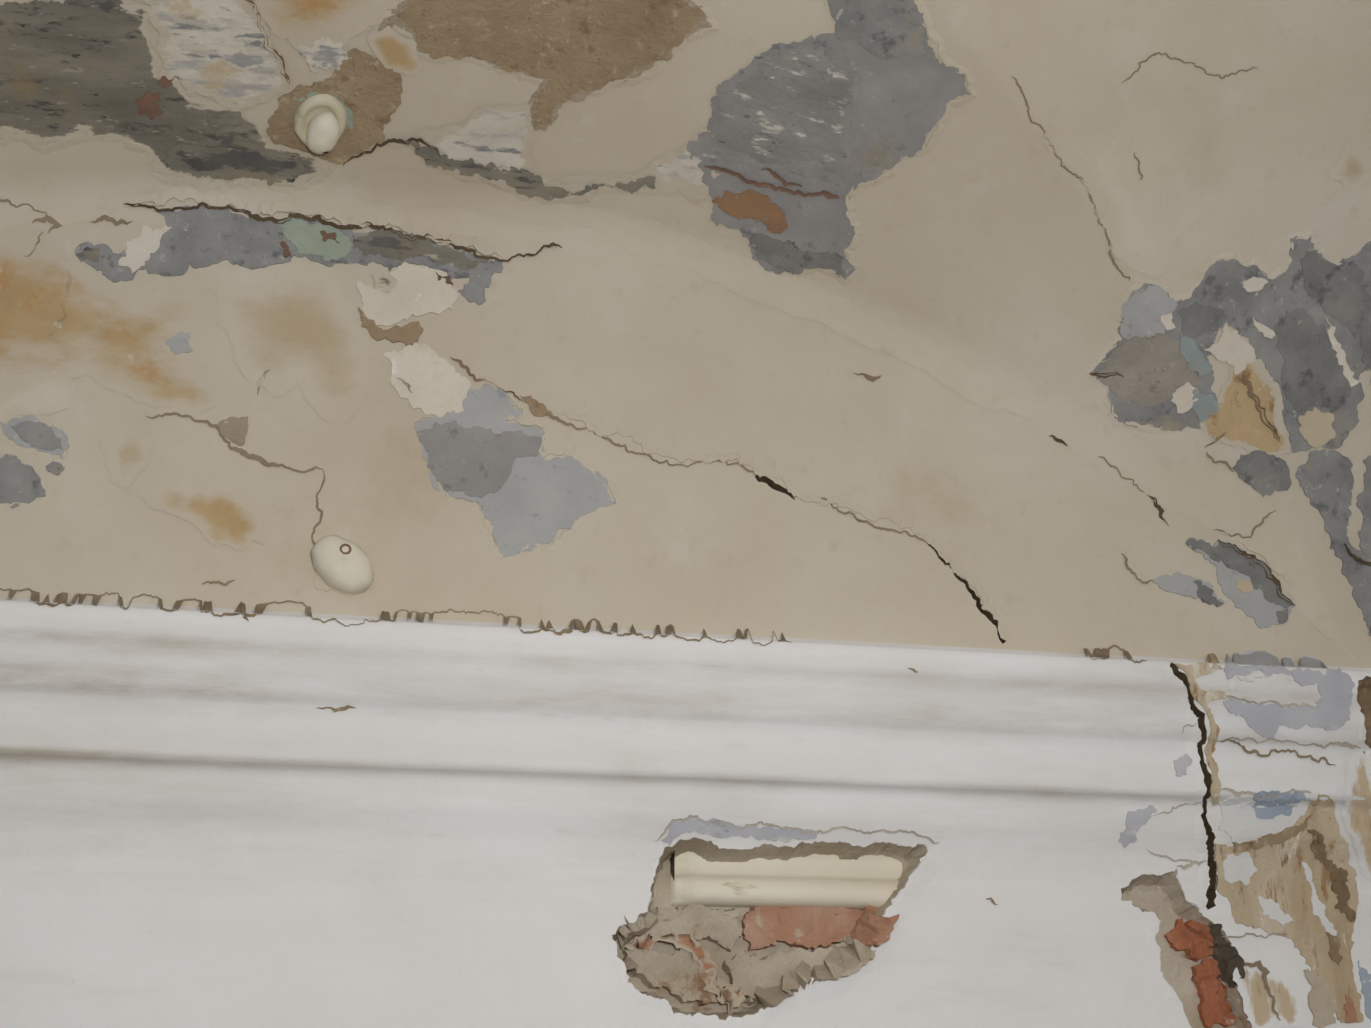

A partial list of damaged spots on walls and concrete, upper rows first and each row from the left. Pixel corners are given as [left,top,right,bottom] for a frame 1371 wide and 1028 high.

leakage [254,0,423,77]
peeling [0,0,978,305]
crack [1011,76,1130,280]
leakage [0,233,371,435]
crack [147,369,325,545]
crack [0,580,790,646]
crack [521,395,1010,644]
crack [1084,645,1226,910]
peeling [1084,228,1371,636]
peeling [1218,650,1371,774]
spalling [604,815,939,1028]
peeling [1118,788,1364,1028]